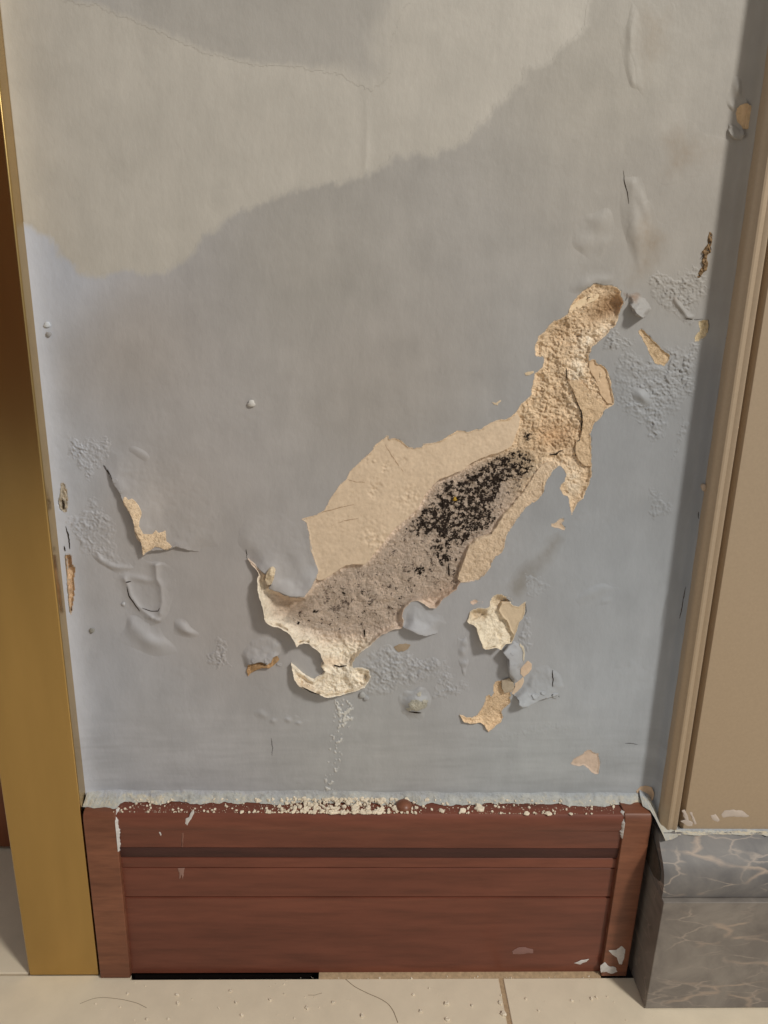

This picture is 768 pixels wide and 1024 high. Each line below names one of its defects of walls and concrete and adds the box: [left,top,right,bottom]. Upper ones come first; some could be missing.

spalling [697,232,713,278]
water stain [23,0,768,820]
spalling [59,482,68,513]
peeling [104,440,224,556]
spalling [237,283,670,698]
spalling [65,553,75,615]
spalling [460,594,564,732]
peeling [570,749,600,774]